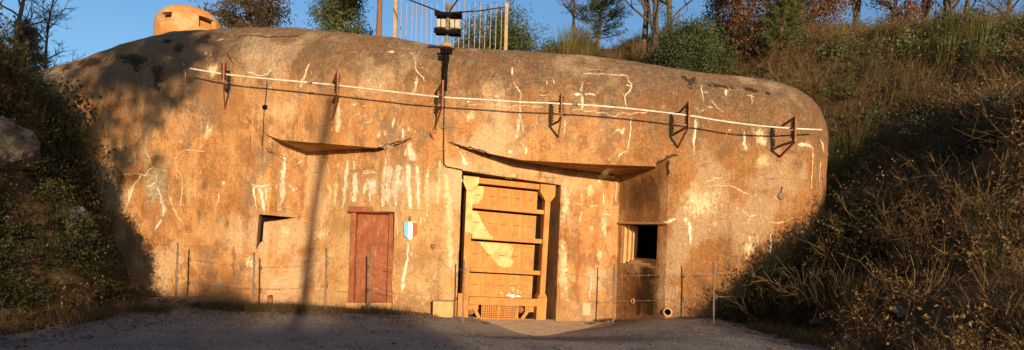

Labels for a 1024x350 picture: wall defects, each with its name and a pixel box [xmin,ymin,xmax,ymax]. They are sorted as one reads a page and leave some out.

damp [251,117,454,300]